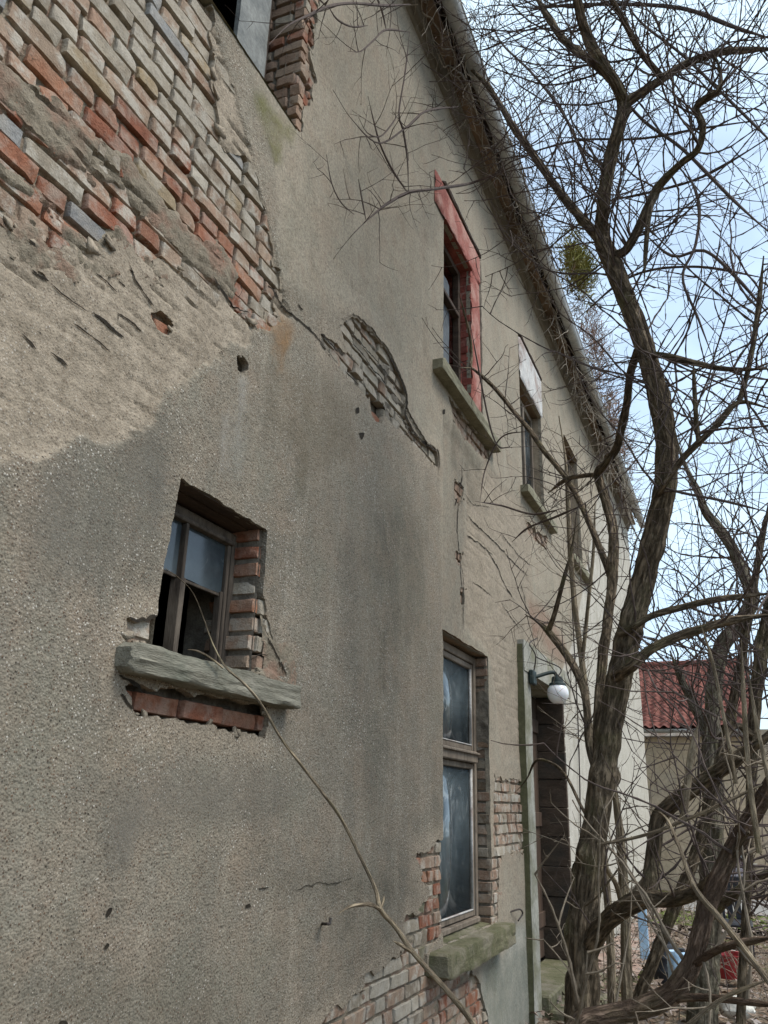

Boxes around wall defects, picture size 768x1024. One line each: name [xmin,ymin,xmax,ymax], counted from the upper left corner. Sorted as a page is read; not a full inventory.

spalling [288,0,319,121]
spalling [0,0,280,334]
spalling [320,310,435,465]
crack [266,279,530,628]
spalling [125,685,266,739]
crack [294,878,351,890]
spalling [322,840,488,1024]
spalling [483,777,523,923]